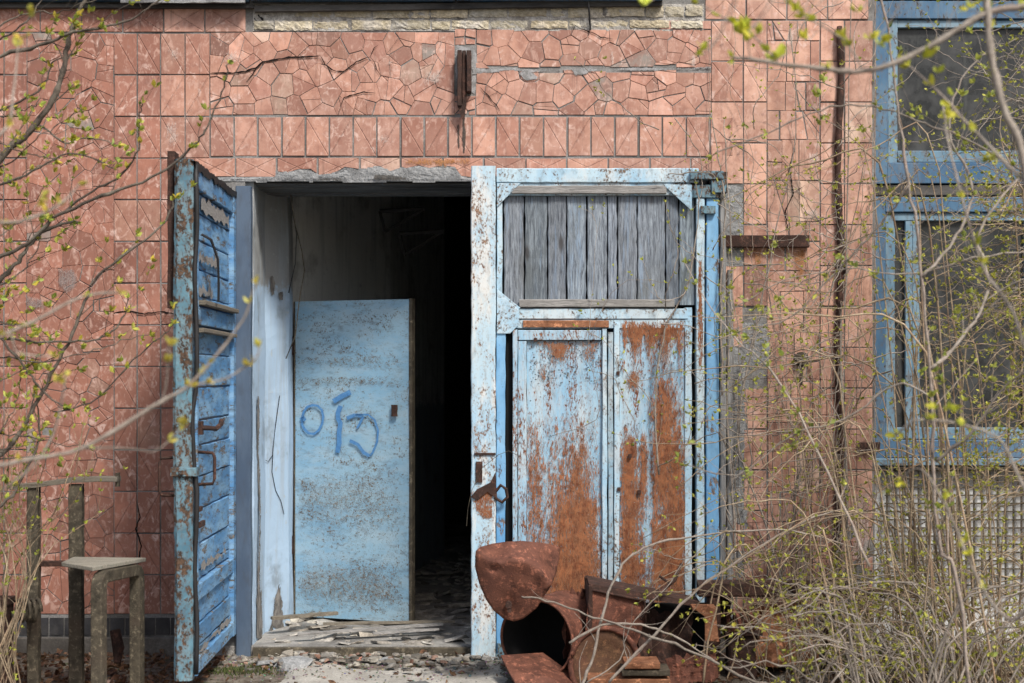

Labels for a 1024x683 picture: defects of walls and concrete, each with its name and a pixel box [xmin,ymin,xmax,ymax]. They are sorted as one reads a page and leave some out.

crack [209,45,381,111]
spalling [218,165,471,183]
corrosion [530,340,599,382]
corrosion [619,319,685,602]
corrosion [526,416,602,595]